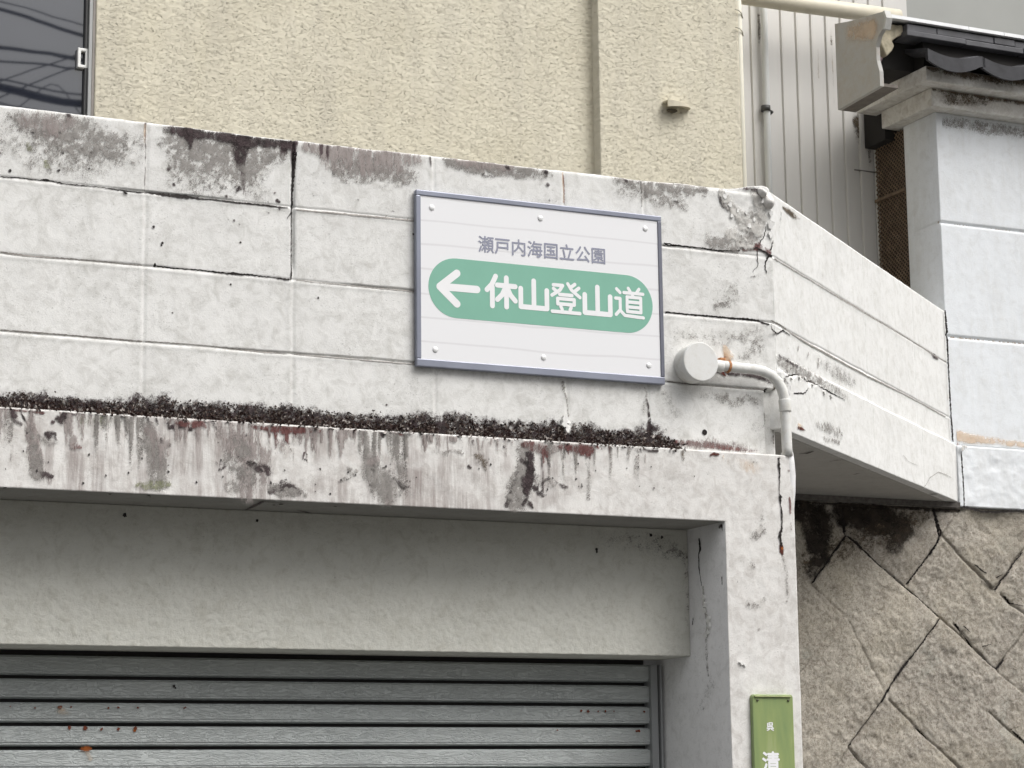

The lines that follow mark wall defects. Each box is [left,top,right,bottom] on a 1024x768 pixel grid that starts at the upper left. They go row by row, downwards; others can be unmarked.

leakage [0,112,144,176]
leakage [158,126,553,214]
spalling [705,186,775,254]
leakage [0,408,417,522]
leakage [421,434,461,455]
leakage [468,393,659,512]
leakage [675,438,752,452]
leakage [706,394,774,444]
crack [663,226,1024,746]
leakage [794,500,960,578]